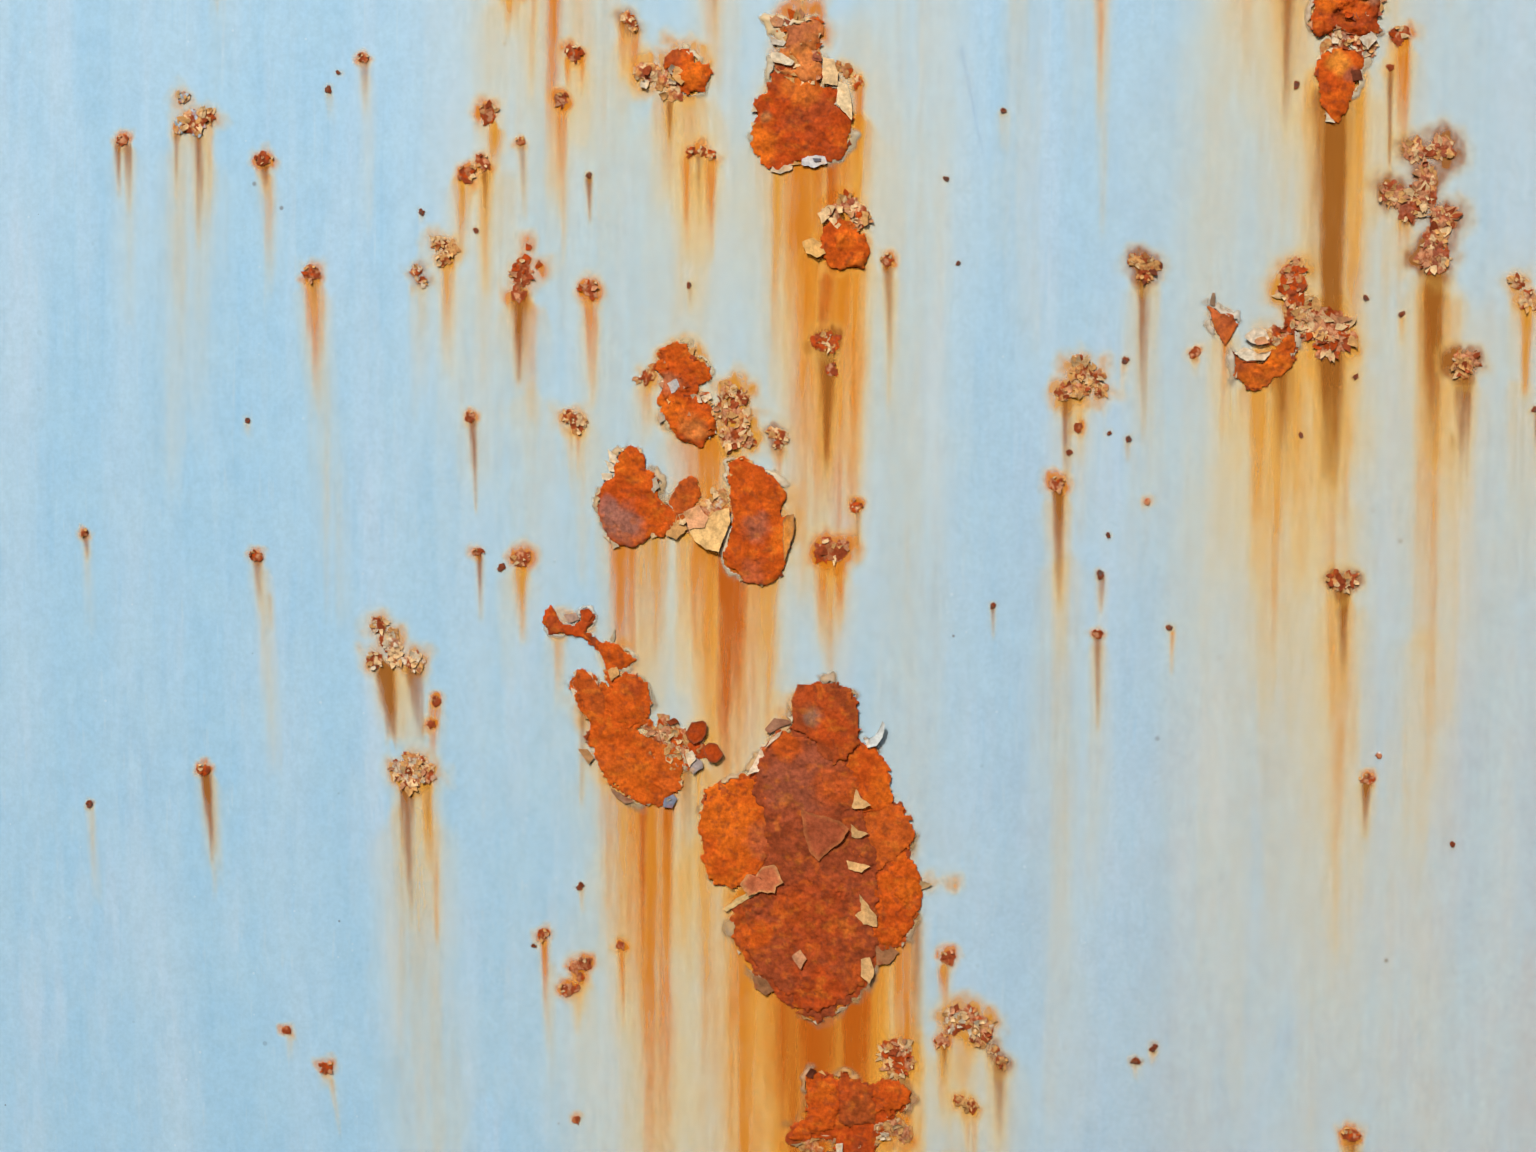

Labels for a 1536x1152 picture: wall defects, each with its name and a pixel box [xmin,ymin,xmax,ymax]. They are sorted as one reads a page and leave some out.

corrosion [619,10,714,136]
corrosion [749,0,897,453]
corrosion [1189,0,1483,531]
corrosion [1050,354,1109,456]
corrosion [1046,471,1069,558]
corrosion [366,616,441,729]
corrosion [542,339,1012,1152]
corrosion [387,751,437,869]
corrosion [531,928,595,997]